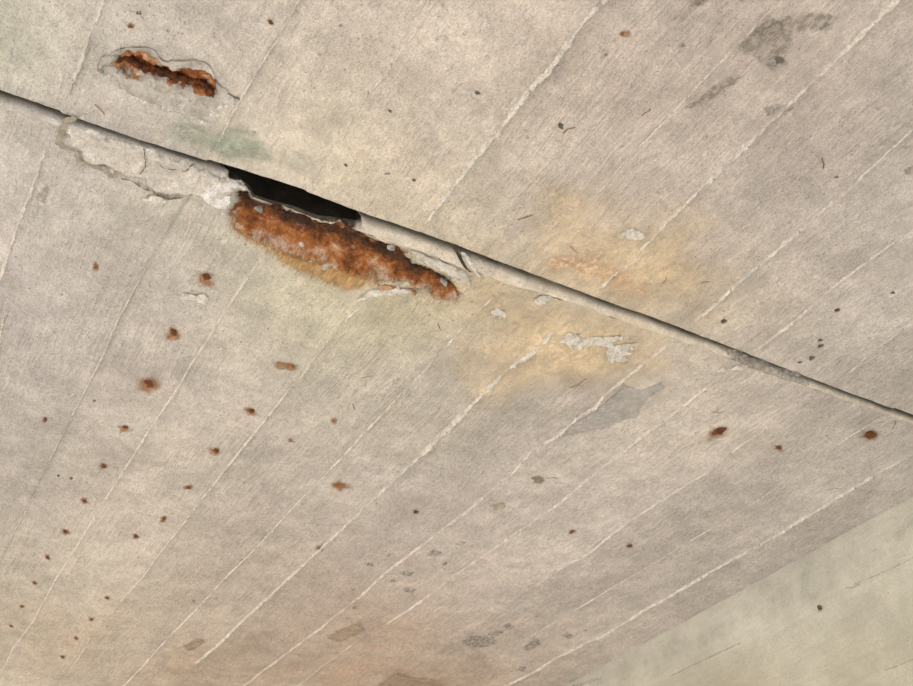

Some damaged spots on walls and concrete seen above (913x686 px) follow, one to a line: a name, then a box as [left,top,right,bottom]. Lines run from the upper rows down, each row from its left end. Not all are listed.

spalling [97,47,240,123]
crack [139,146,194,175]
spalling [201,163,471,301]
peeling [559,333,638,364]
rust [141,379,158,392]